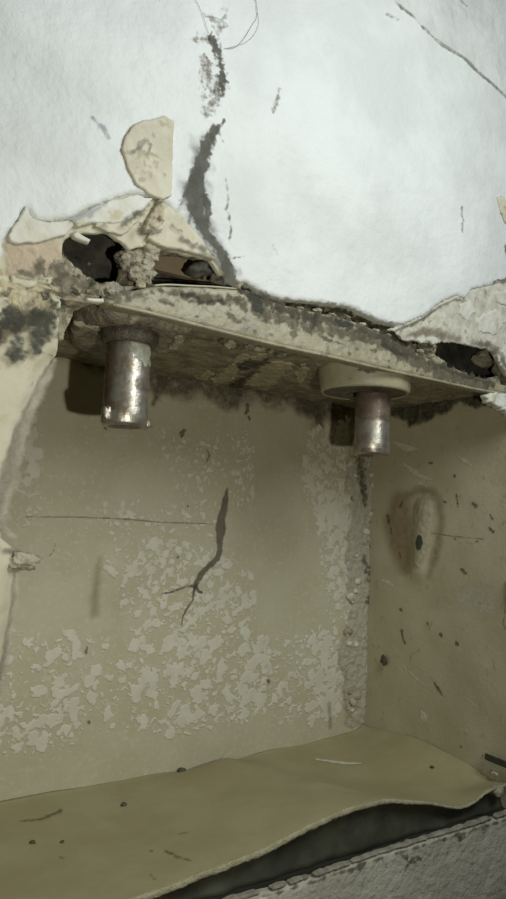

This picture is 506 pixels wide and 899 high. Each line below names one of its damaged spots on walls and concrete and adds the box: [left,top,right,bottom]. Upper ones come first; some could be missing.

spalling [0,359,56,538]
leakage [0,289,59,363]
leakage [73,320,99,331]
peeling [0,116,506,417]
leakage [391,395,487,427]
crack [30,489,228,622]
peeling [0,415,358,755]
leakage [149,359,373,726]